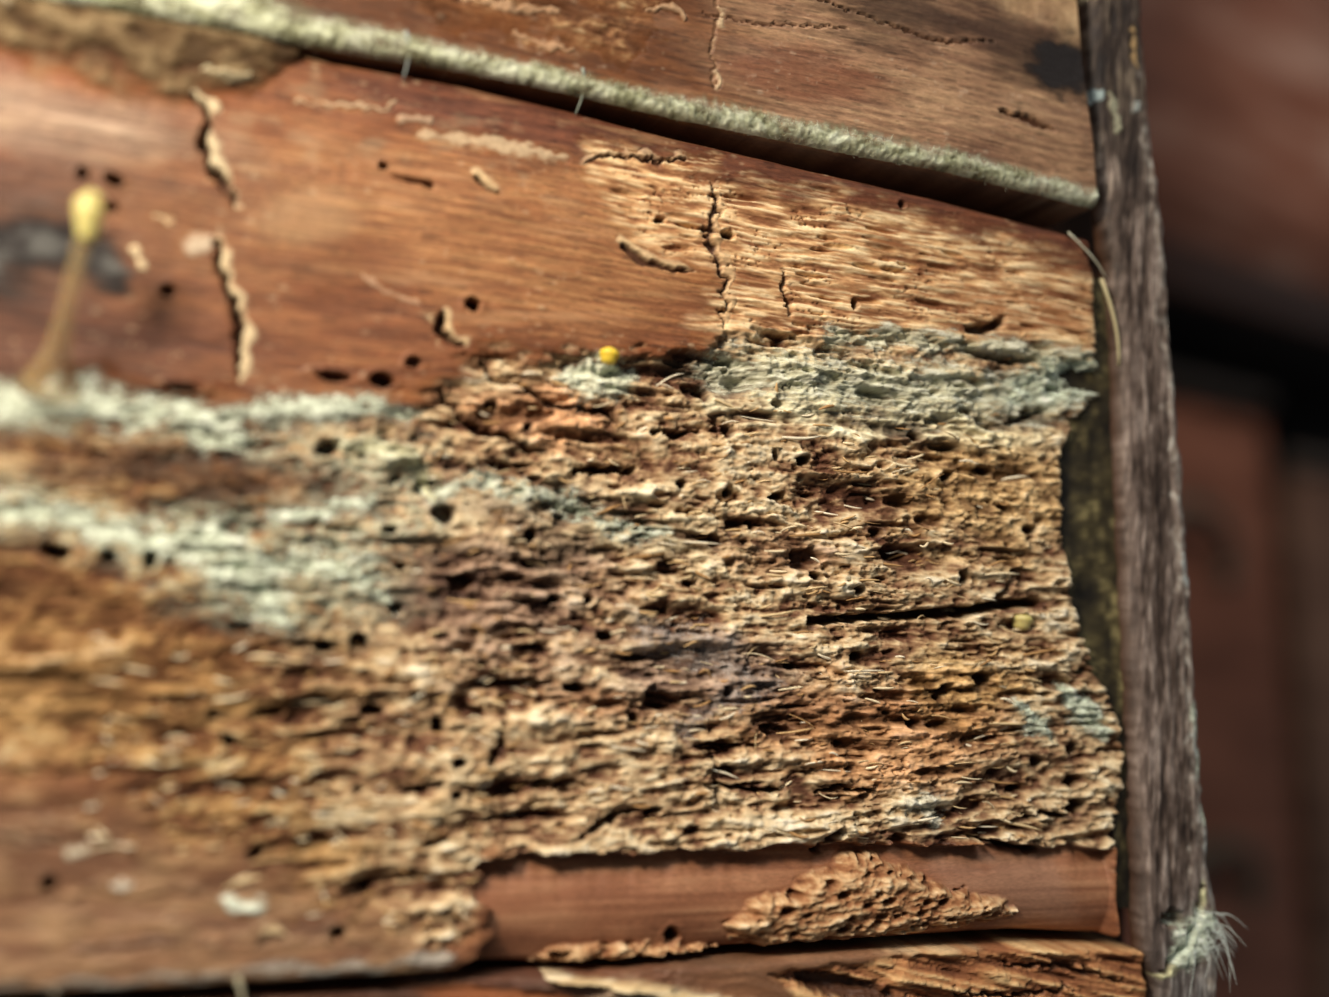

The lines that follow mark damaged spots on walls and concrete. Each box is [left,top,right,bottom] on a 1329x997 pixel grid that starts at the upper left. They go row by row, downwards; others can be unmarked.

crack [702,0,988,91]
damp [856,0,1086,96]
damp [413,125,571,164]
damp [0,218,130,295]
crack [188,88,259,385]
crack [580,143,738,329]
damp [551,353,639,403]
damp [693,322,1099,426]
damp [0,376,672,540]
damp [0,493,395,629]
spalling [763,947,1147,997]